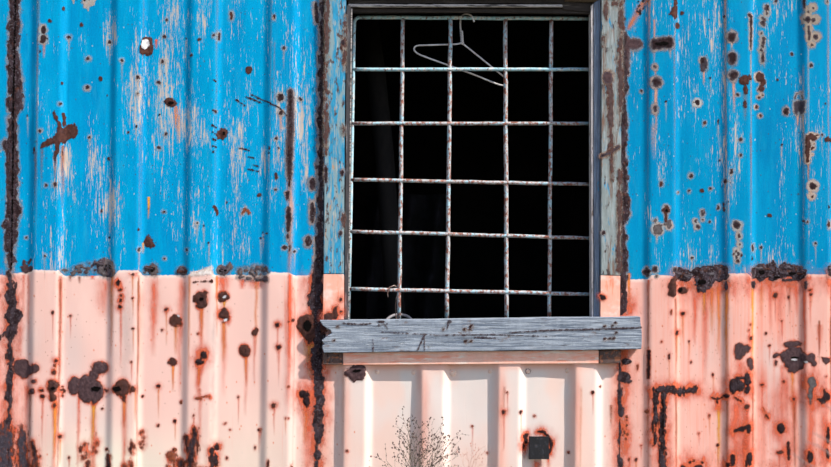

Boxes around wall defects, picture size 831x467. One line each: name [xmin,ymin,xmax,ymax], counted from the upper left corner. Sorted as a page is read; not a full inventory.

peeling [62,0,96,11]
rust [800,0,822,48]
rust [782,91,807,124]
rust [33,110,78,171]
rust [599,0,684,316]
rust [804,132,831,200]
rust [20,258,33,273]
rust [0,273,145,467]
rust [344,365,366,382]
rust [610,265,831,467]
rust [165,414,228,467]
rust [521,427,555,467]